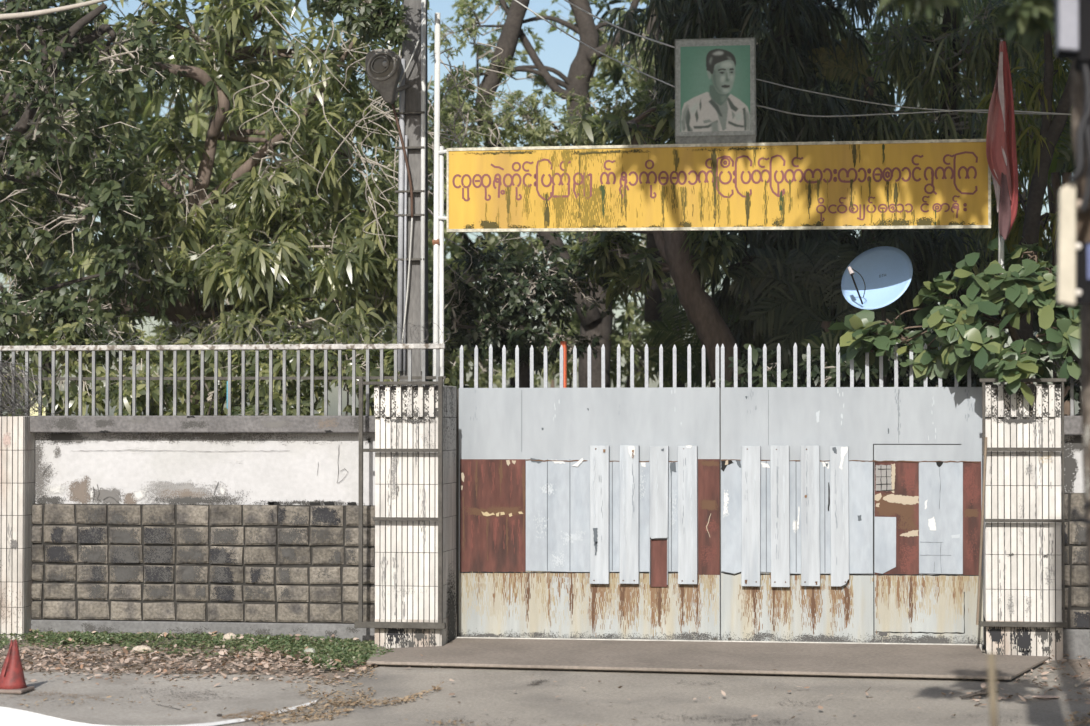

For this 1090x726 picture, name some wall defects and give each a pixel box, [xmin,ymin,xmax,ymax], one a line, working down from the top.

leakage [34,385,456,601]